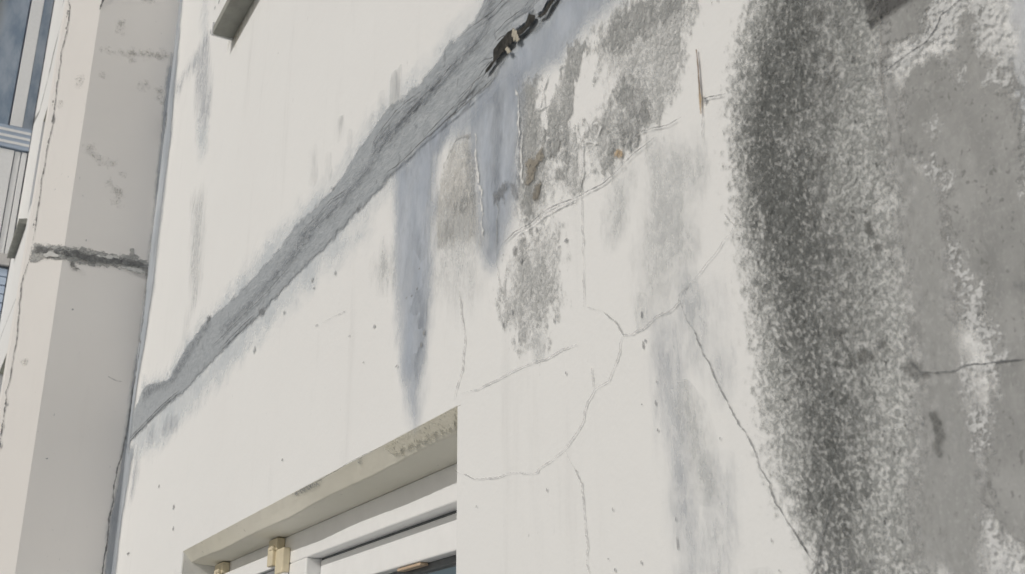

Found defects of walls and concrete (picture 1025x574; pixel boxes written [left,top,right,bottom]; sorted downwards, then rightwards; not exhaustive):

damp [592,0,698,151]
damp [437,145,484,247]
damp [496,226,568,353]
crack [583,283,689,364]
damp [722,0,933,574]
crack [102,271,177,574]
crack [693,329,833,574]